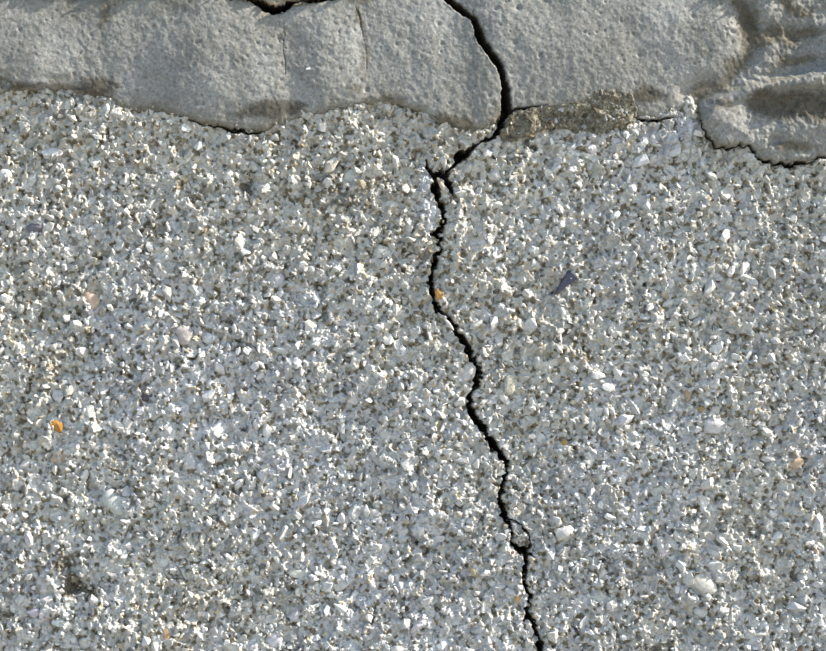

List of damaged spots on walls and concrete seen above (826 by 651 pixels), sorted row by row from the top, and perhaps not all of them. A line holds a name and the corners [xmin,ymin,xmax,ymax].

crack [425,0,544,651]